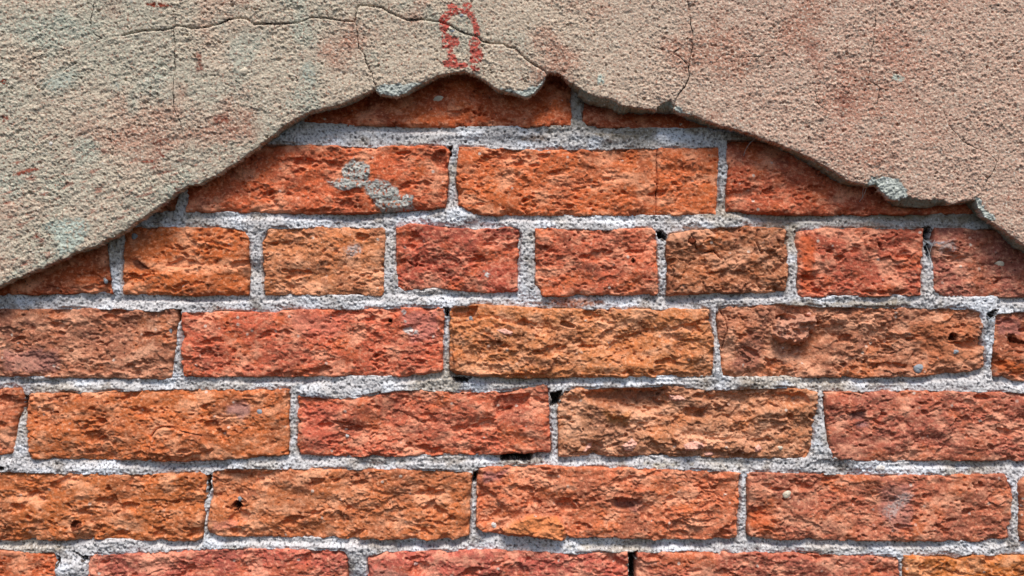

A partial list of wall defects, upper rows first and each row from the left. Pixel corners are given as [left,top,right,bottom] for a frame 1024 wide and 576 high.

spalling [58,186,190,262]
crack [22,4,548,147]
peeling [328,159,414,214]
spalling [228,73,545,167]
crack [672,0,694,110]
spalling [562,77,1024,253]